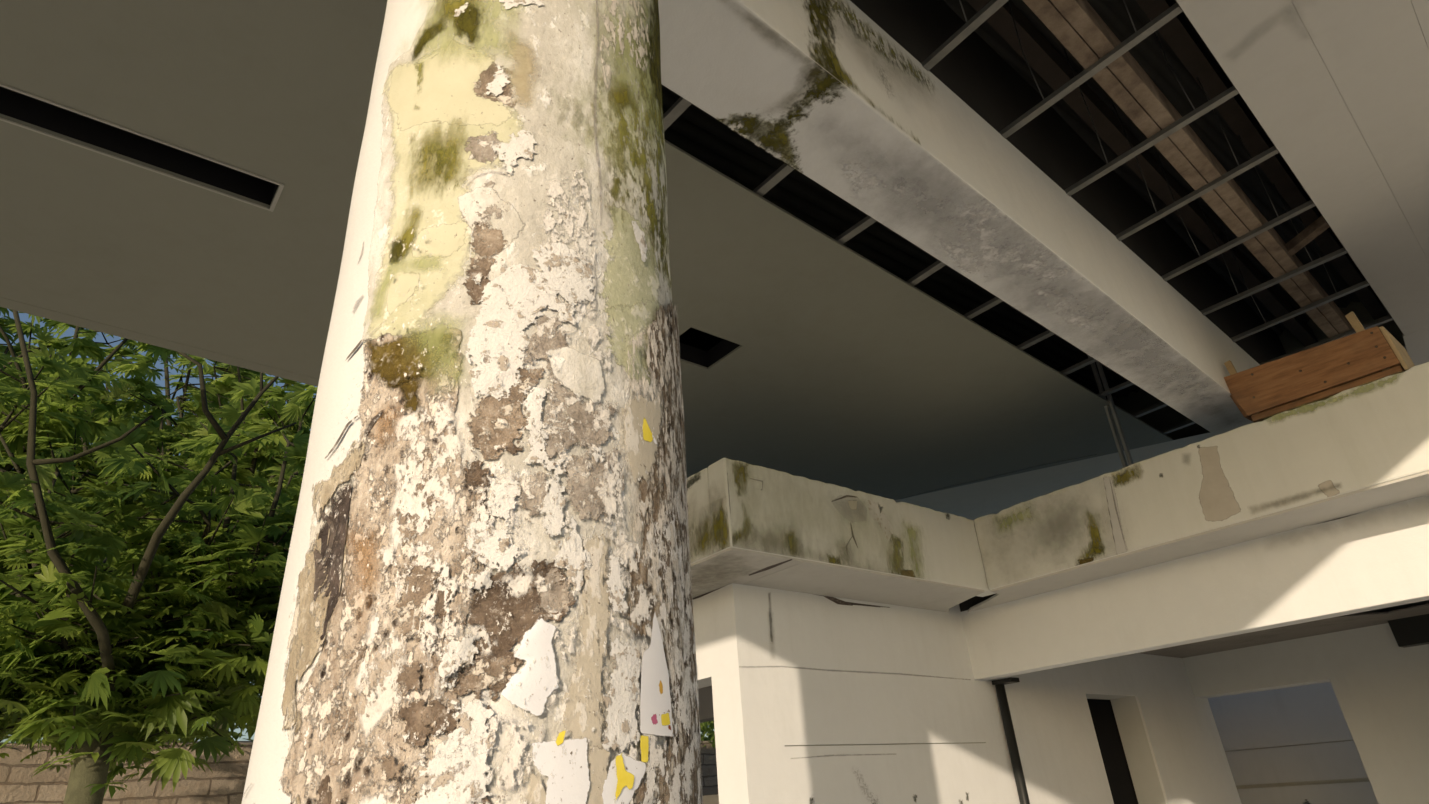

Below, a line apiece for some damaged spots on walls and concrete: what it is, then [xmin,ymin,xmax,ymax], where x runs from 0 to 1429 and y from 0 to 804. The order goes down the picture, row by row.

damp [412,5,480,84]
damp [829,51,857,88]
damp [611,85,630,107]
damp [418,147,454,180]
damp [729,122,791,160]
damp [615,175,666,267]
damp [390,241,403,264]
damp [895,177,1210,399]
flaking render [280,0,703,804]
peeling [1199,446,1241,521]
damp [893,527,919,577]
damp [1078,547,1103,565]